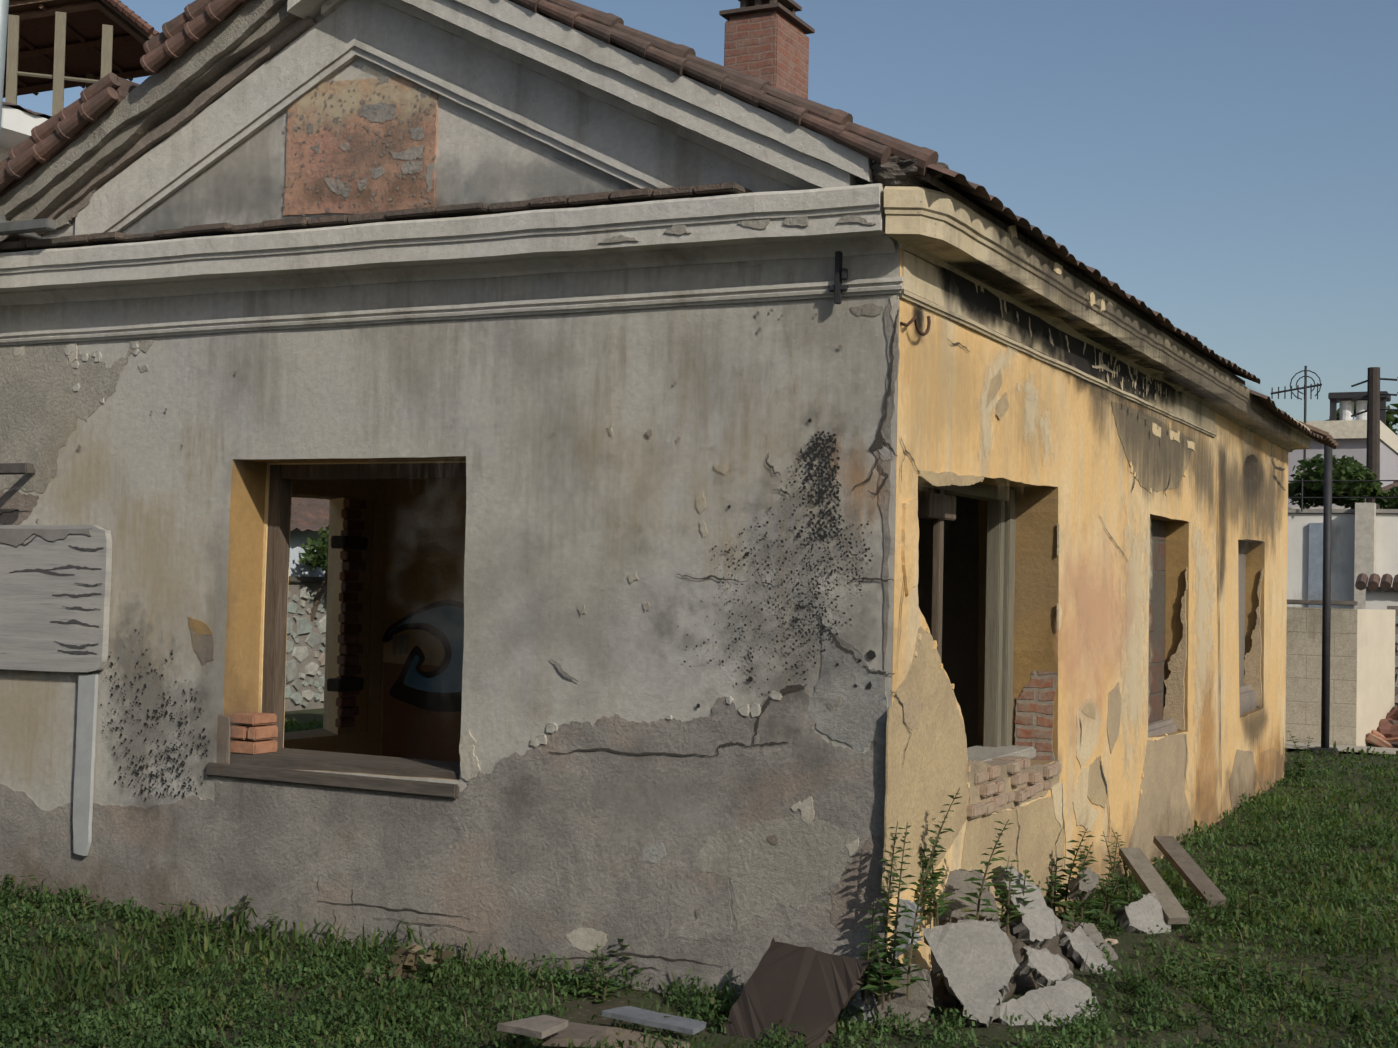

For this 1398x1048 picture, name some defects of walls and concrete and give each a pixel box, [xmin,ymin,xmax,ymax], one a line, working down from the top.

flaking render [283,75,439,216]
crack [851,310,920,495]
damp [974,282,1031,332]
damp [1049,328,1152,384]
mould [677,418,873,696]
mould [100,623,210,801]
flaking render [0,295,1122,1006]
crack [548,684,807,757]
flaking render [1128,568,1193,862]
spalling [1244,569,1263,707]
flaking render [1229,748,1283,811]